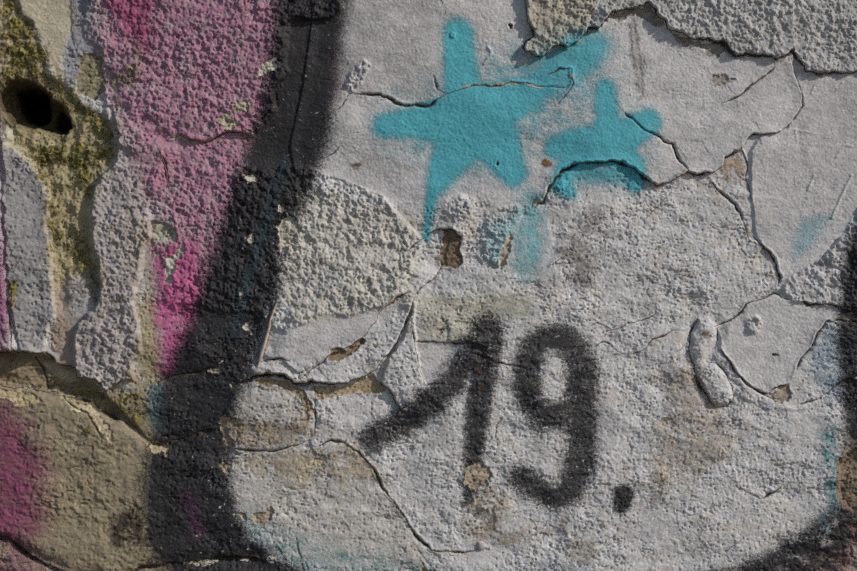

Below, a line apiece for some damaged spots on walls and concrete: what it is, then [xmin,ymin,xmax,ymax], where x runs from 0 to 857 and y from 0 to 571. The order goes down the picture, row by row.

spalling [610,4,725,58]
spalling [712,74,737,87]
crack [159,128,262,169]
crack [317,0,857,409]
spalling [440,230,463,269]
spalling [0,388,43,407]
spalling [61,396,114,444]
crack [0,228,528,571]
peeling [146,443,170,457]
crack [737,483,784,499]
spalling [835,450,857,513]